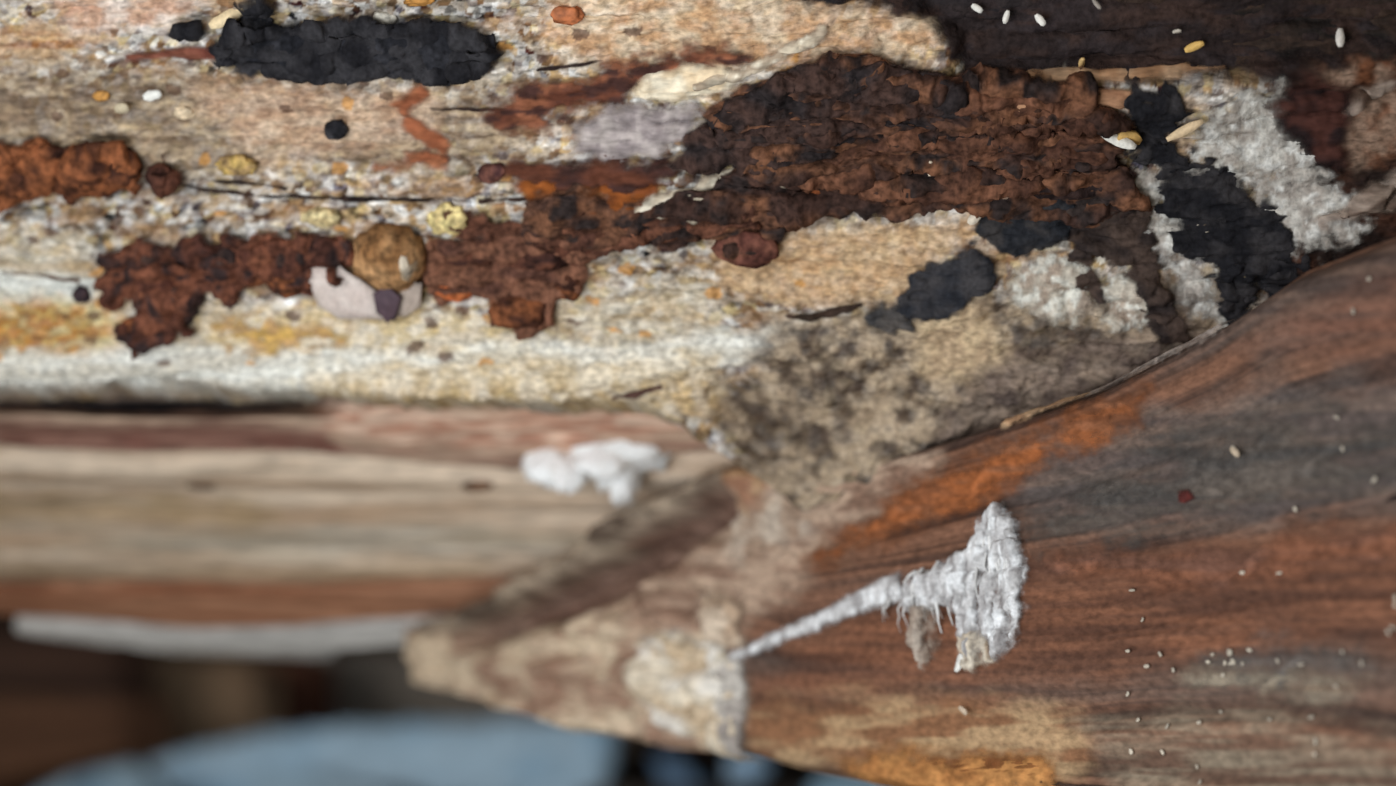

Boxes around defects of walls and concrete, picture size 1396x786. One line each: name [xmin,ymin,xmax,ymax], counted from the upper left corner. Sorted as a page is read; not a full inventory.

leakage [166,0,504,88]
rust [483,43,754,137]
rust [504,155,681,212]
leakage [443,206,762,253]
leakage [646,0,1396,427]
rust [211,315,344,358]
leakage [0,398,347,412]
leakage [521,440,673,506]
leakage [728,502,1027,671]